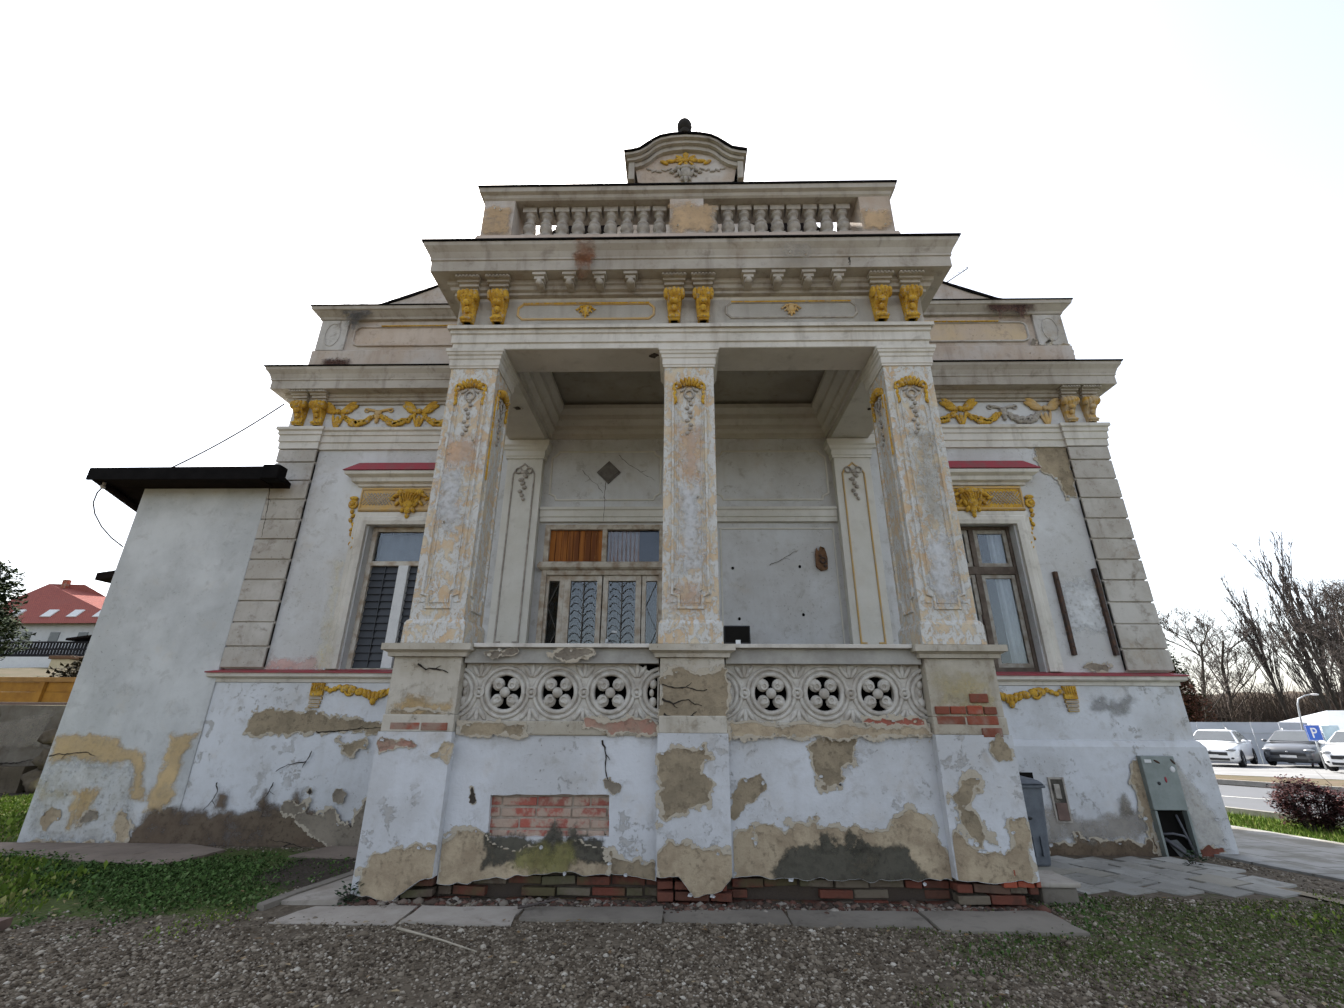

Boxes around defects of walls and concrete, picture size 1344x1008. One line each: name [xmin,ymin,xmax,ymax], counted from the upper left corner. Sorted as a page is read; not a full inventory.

corrosion [574,241,594,277]
peeling [1028,447,1078,501]
crack [662,682,707,716]
peeling [28,759,135,843]
water stain [0,714,326,847]
crack [601,740,610,781]
peeling [242,663,1042,909]
spalling [1049,755,1162,856]
water stain [480,822,608,874]
water stain [772,829,928,882]